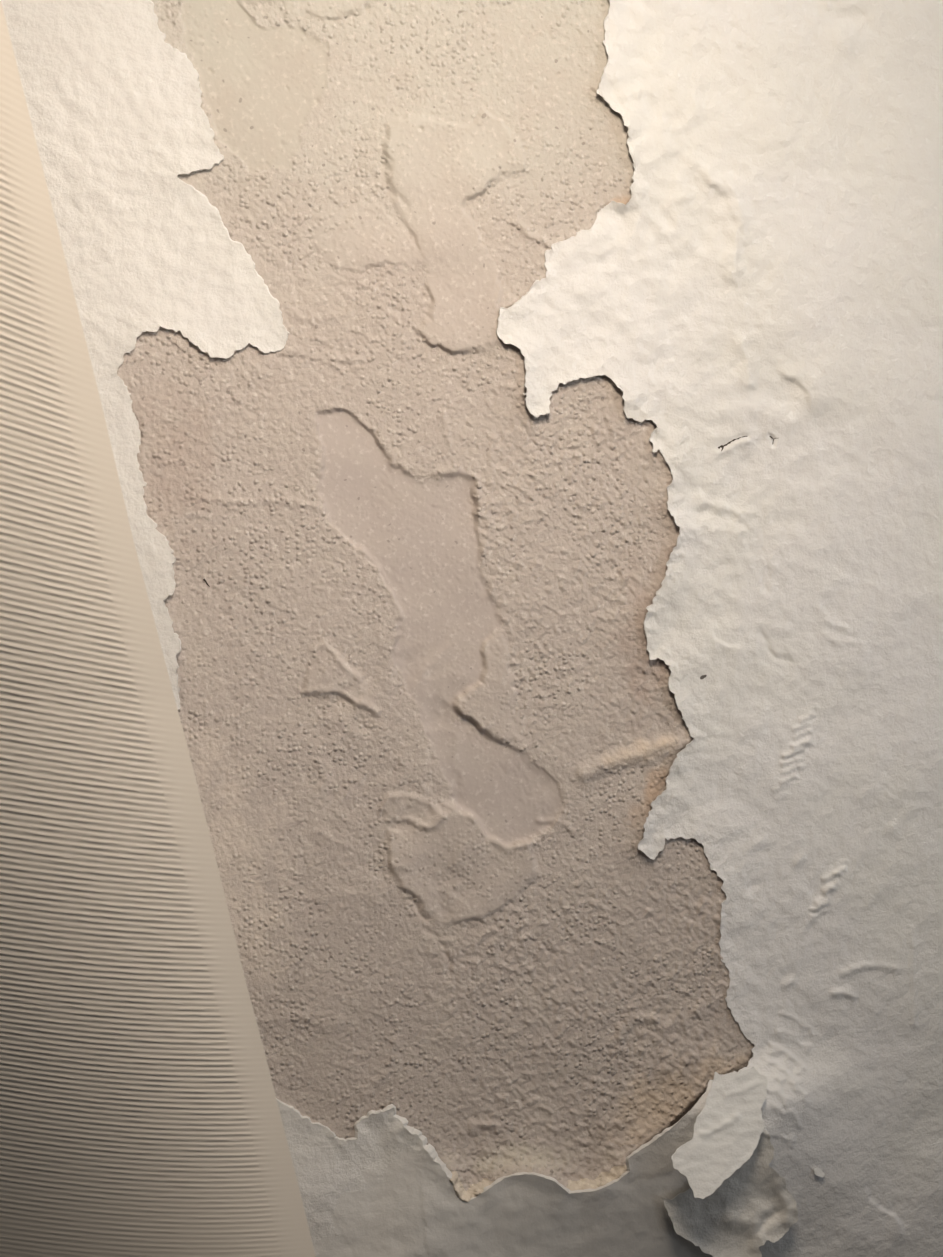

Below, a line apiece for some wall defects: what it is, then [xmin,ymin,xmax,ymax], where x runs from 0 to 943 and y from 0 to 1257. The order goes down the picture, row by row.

peeling [89,0,798,1257]